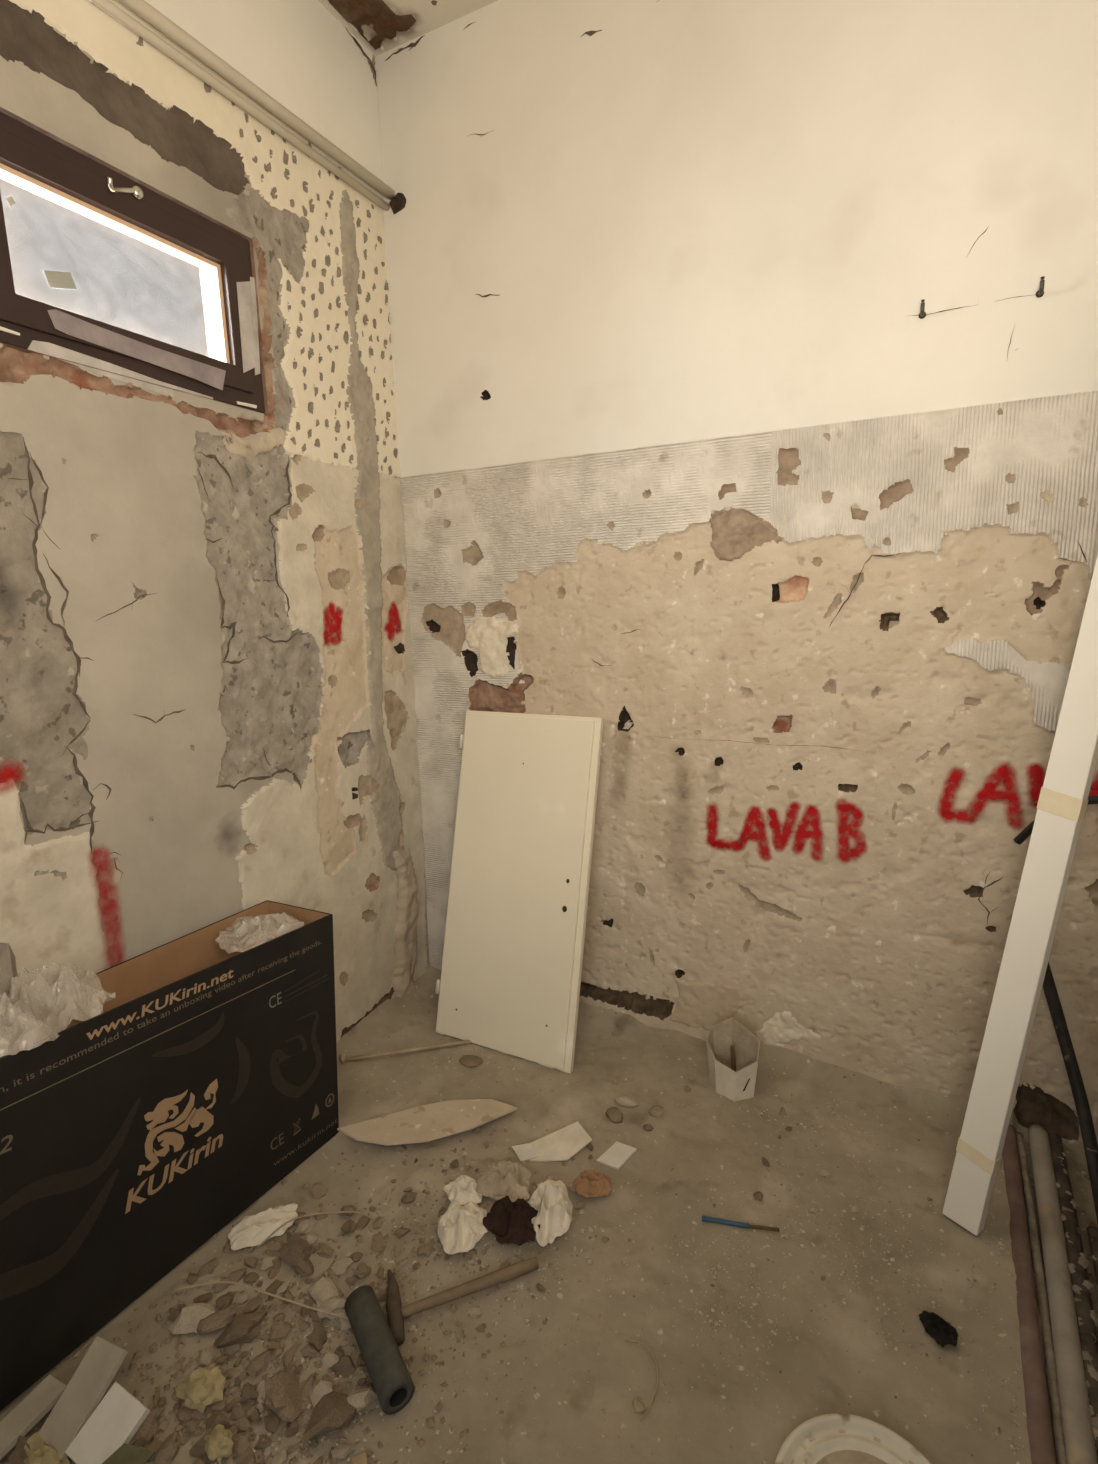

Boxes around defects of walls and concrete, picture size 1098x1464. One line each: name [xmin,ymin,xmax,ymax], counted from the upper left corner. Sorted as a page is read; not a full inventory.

spalling [328,0,416,86]
flaking render [274,483,315,531]
spalling [776,448,801,486]
spalling [944,446,970,473]
crack [7,437,158,879]
spalling [296,479,1093,1097]
spalling [1013,804,1098,1142]